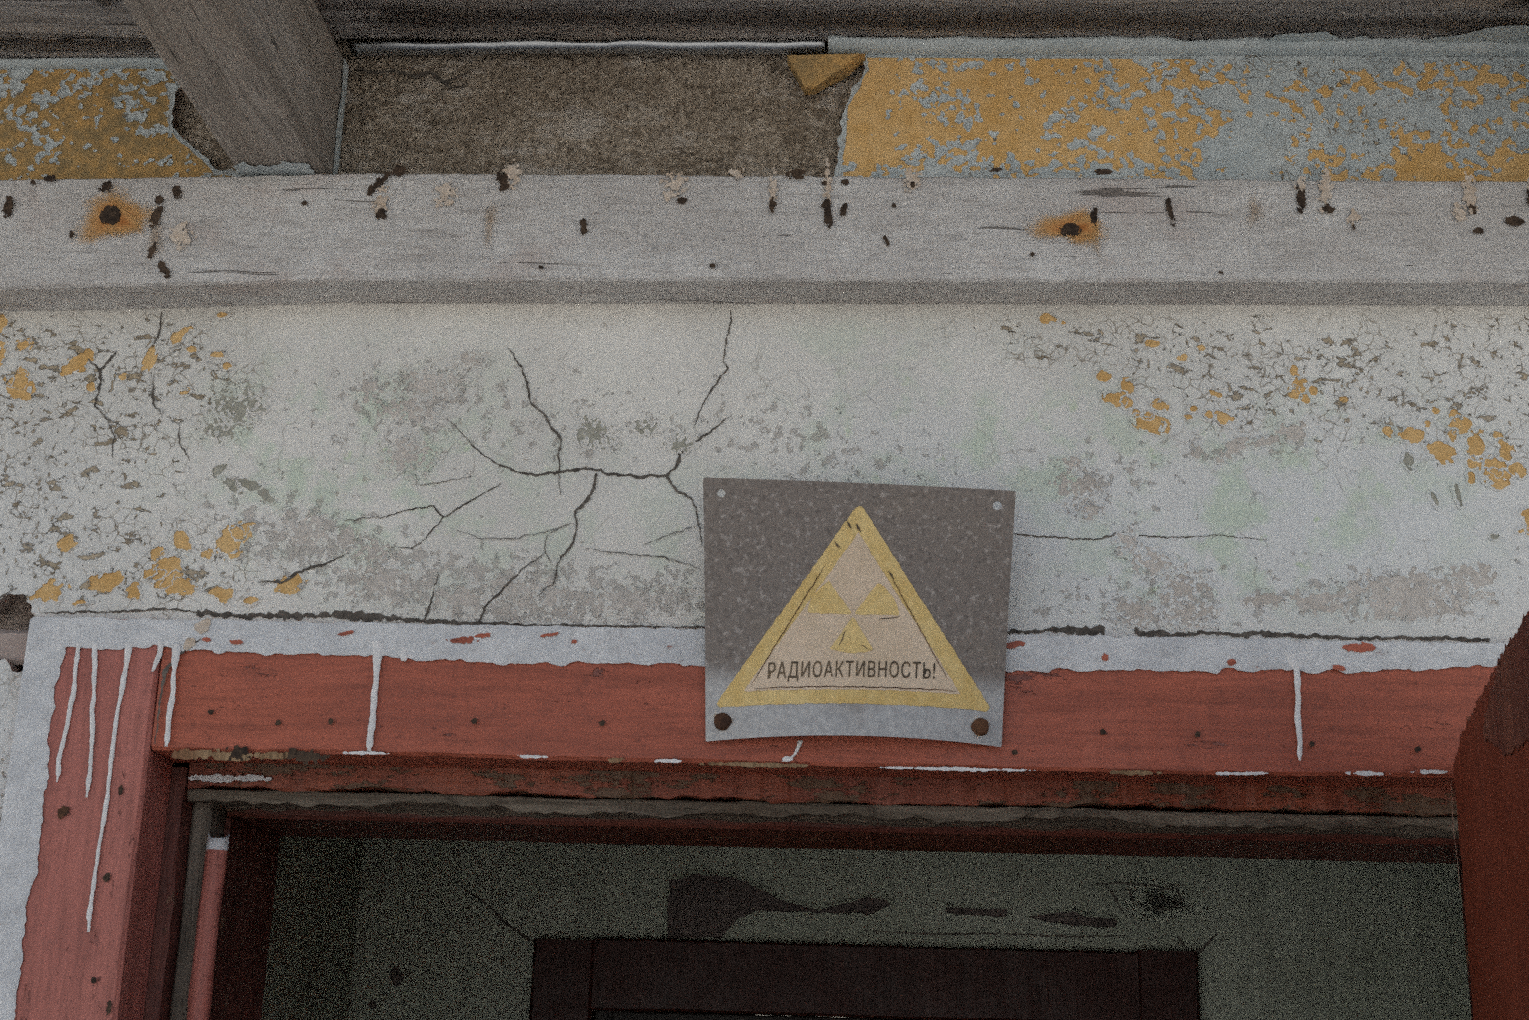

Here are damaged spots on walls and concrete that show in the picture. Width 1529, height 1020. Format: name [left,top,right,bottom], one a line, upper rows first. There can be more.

flaking render [333,39,1529,231]
peeling [0,68,236,278]
corrosion [84,194,149,240]
corrosion [1035,211,1099,243]
peeling [1037,311,1068,327]
peeling [1093,362,1351,464]
crack [44,309,732,629]
peeling [1377,405,1529,510]
peeling [1488,506,1529,542]
peeling [171,748,288,783]
flaking render [662,869,895,941]